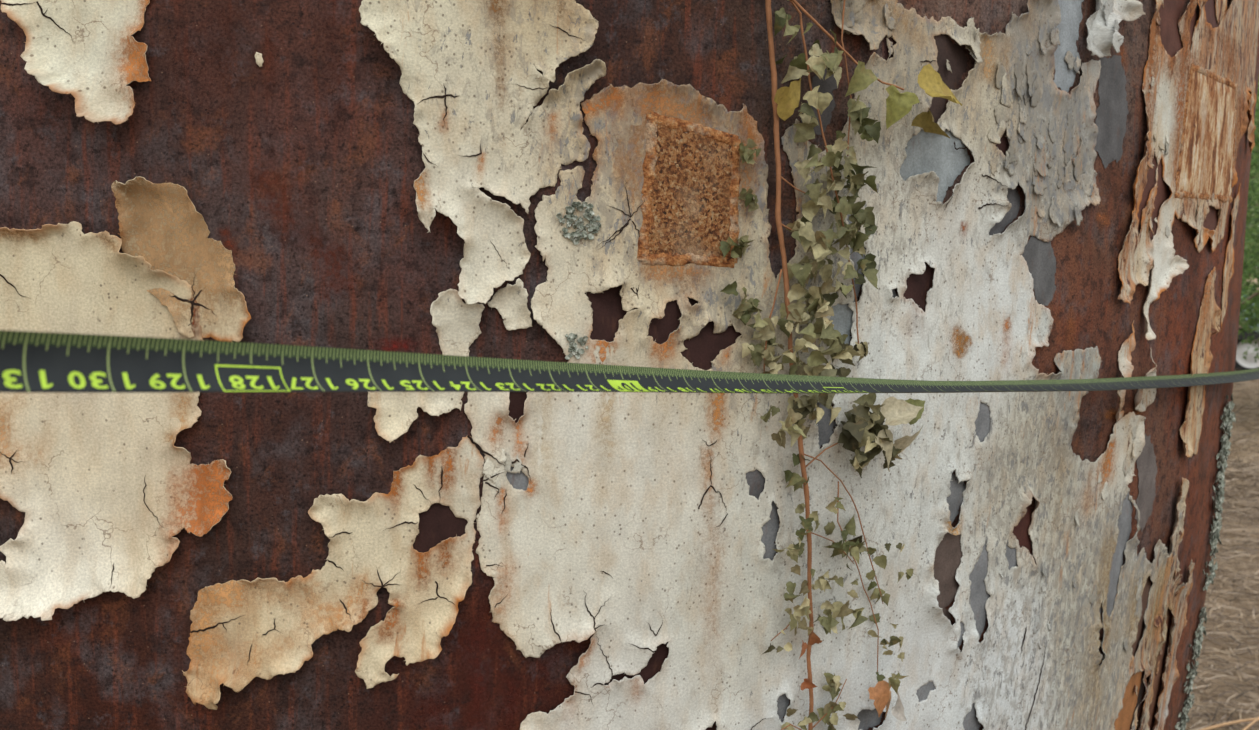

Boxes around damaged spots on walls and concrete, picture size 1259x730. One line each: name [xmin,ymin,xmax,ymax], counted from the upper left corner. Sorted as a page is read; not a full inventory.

crack [1,1,75,44]
peeling [1,0,151,125]
rust [125,25,151,91]
rust [1146,0,1198,152]
rust [104,177,240,334]
peeling [359,0,1259,458]
peeling [0,392,231,622]
rust [187,580,246,698]
crack [327,532,455,619]
crack [467,435,531,517]
crack [575,571,663,706]
peeling [182,388,1195,730]